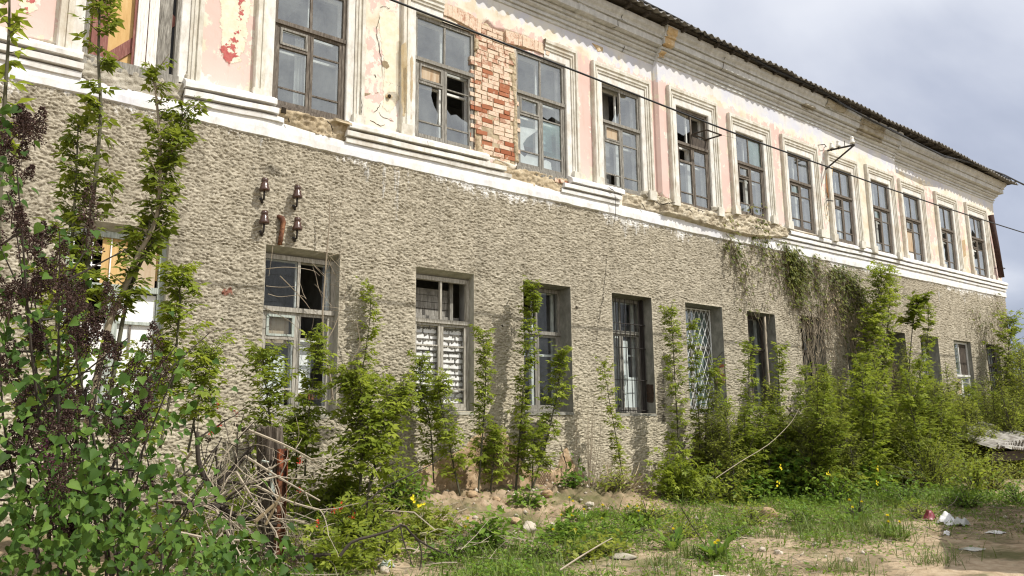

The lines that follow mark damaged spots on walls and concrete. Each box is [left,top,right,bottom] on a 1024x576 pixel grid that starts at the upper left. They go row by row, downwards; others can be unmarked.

peeling [219,0,251,65]
peeling [376,6,401,113]
spalling [262,104,352,141]
flaking render [443,4,569,192]
spalling [622,190,789,239]